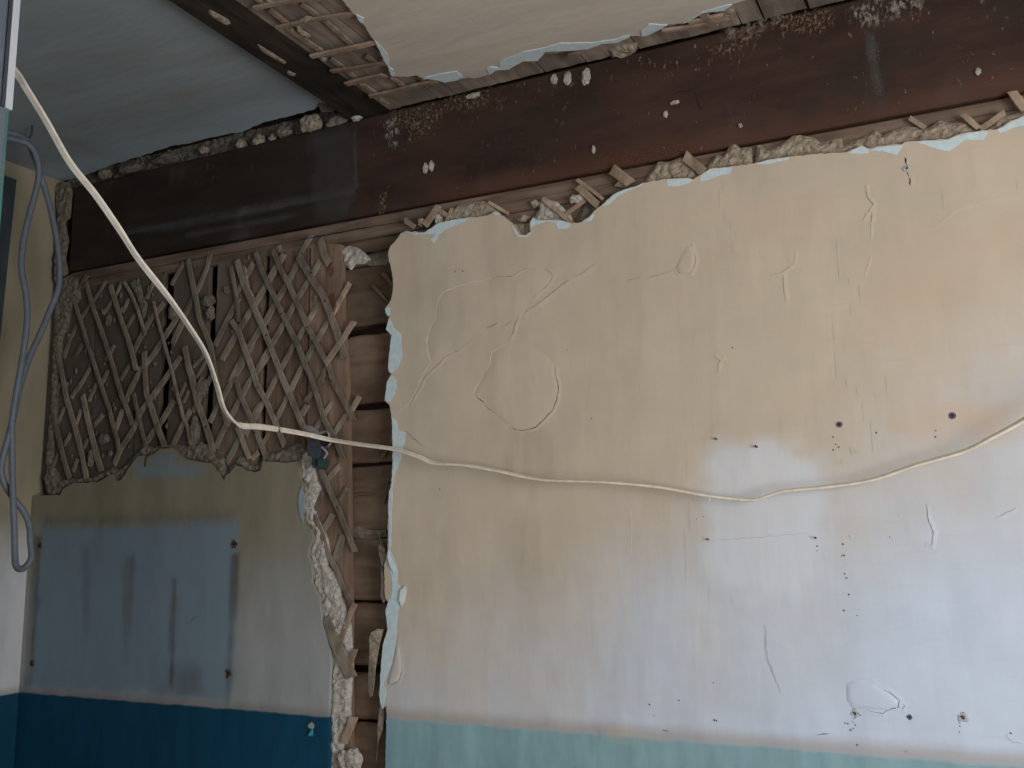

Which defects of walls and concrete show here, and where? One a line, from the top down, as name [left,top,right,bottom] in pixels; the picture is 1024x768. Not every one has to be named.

peeling [374,40,395,76]
peeling [423,71,463,83]
spalling [550,68,591,86]
peeling [487,23,667,75]
rust [711,11,829,54]
spalling [54,117,305,283]
spalling [411,111,1024,243]
crack [474,315,562,435]
crack [924,504,938,550]
spalling [43,442,354,768]
peeling [368,417,407,761]
crack [764,625,781,693]